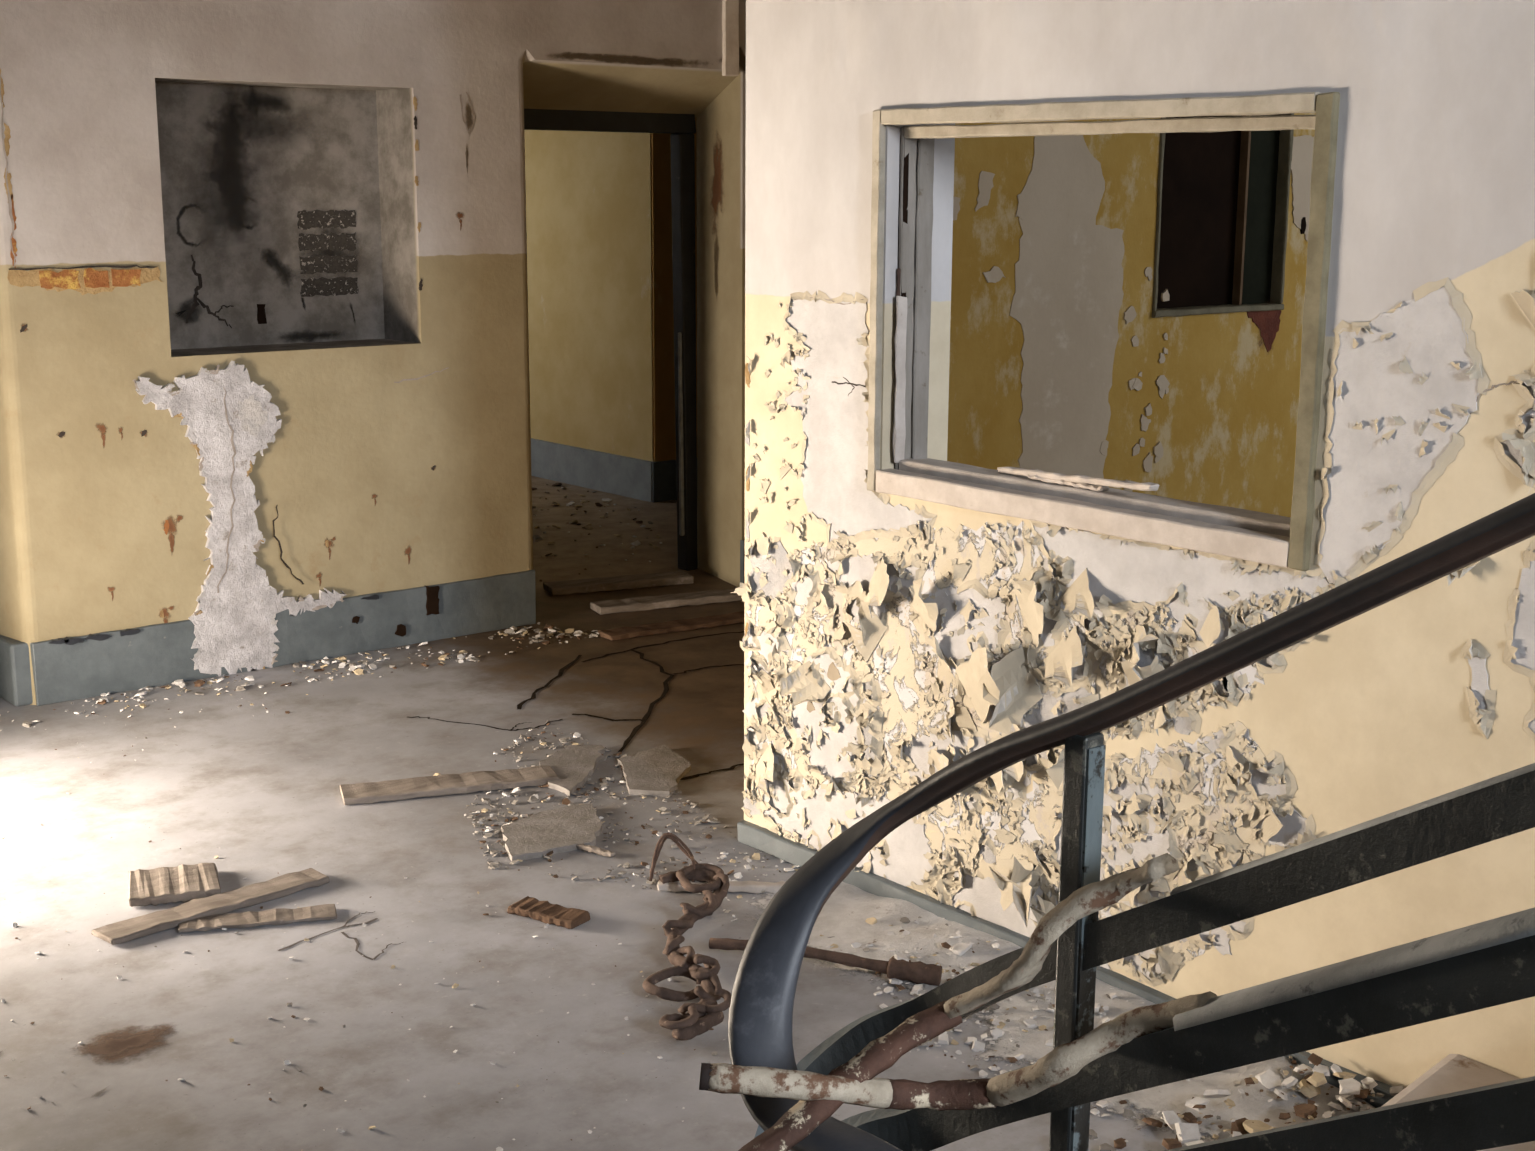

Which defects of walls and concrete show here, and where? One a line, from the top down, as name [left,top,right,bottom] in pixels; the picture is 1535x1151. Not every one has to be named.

flaking render [0,69,162,295]
flaking render [983,135,1170,492]
rust [96,424,123,448]
rust [159,606,174,623]
rust [163,515,183,552]
rust [316,537,335,586]
peeling [731,277,1490,851]
crack [408,631,744,752]
crack [680,763,744,780]
peeling [1098,634,1318,920]
peeling [854,744,1065,937]
peeling [1100,917,1254,987]